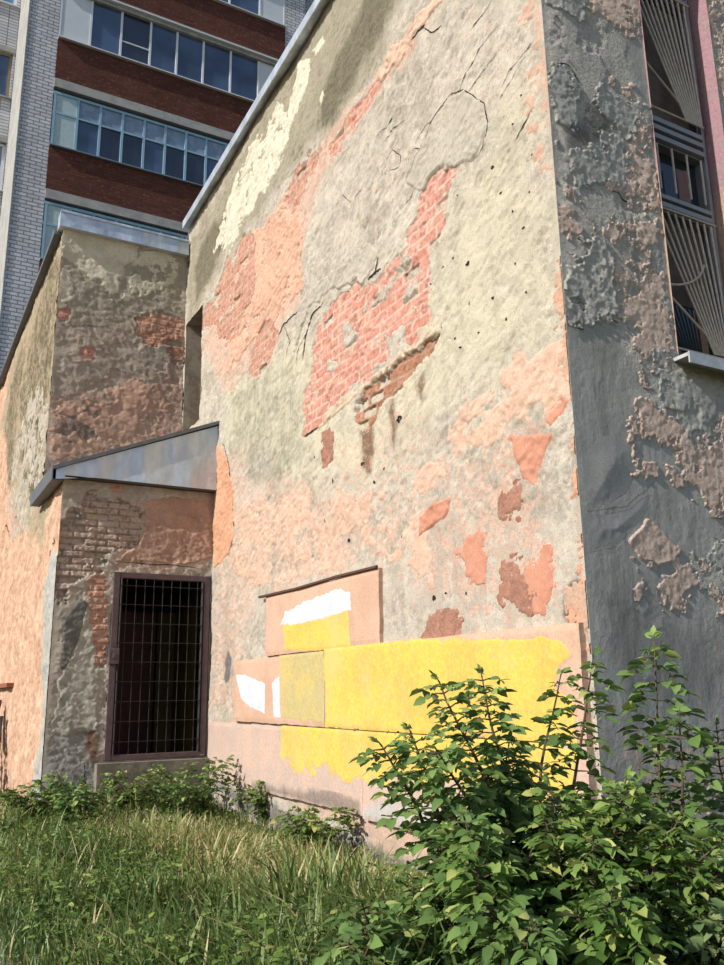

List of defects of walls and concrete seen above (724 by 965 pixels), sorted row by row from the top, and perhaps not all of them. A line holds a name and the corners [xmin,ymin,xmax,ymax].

peeling [31,0,724,803]
crack [379,0,531,207]